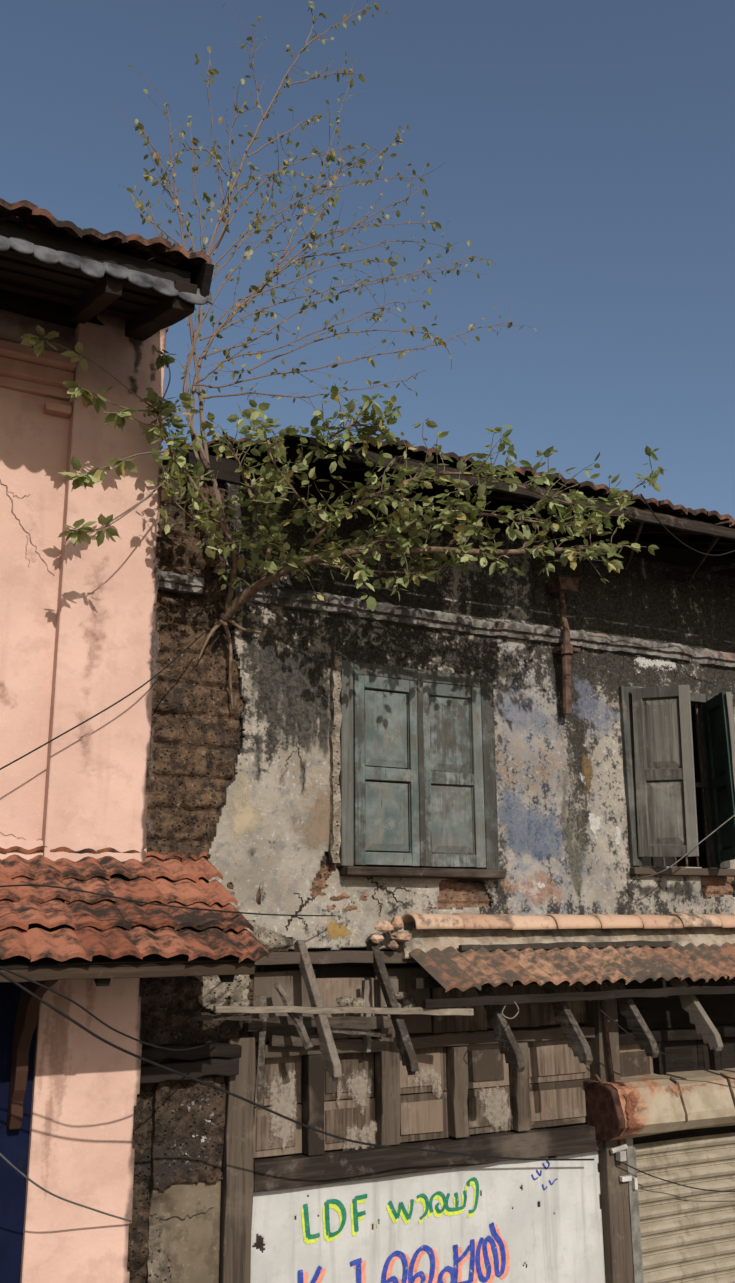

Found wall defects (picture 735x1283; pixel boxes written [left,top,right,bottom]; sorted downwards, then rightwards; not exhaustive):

crack [0,480,55,576]
leakage [251,636,331,790]
leakage [562,783,586,892]
peeling [588,813,602,839]
spalling [310,852,370,912]
spalling [425,868,506,911]
peeling [502,874,561,904]
spalling [701,876,734,899]
spalling [244,920,295,952]
spalling [193,965,256,1011]
rust [623,1092,645,1135]